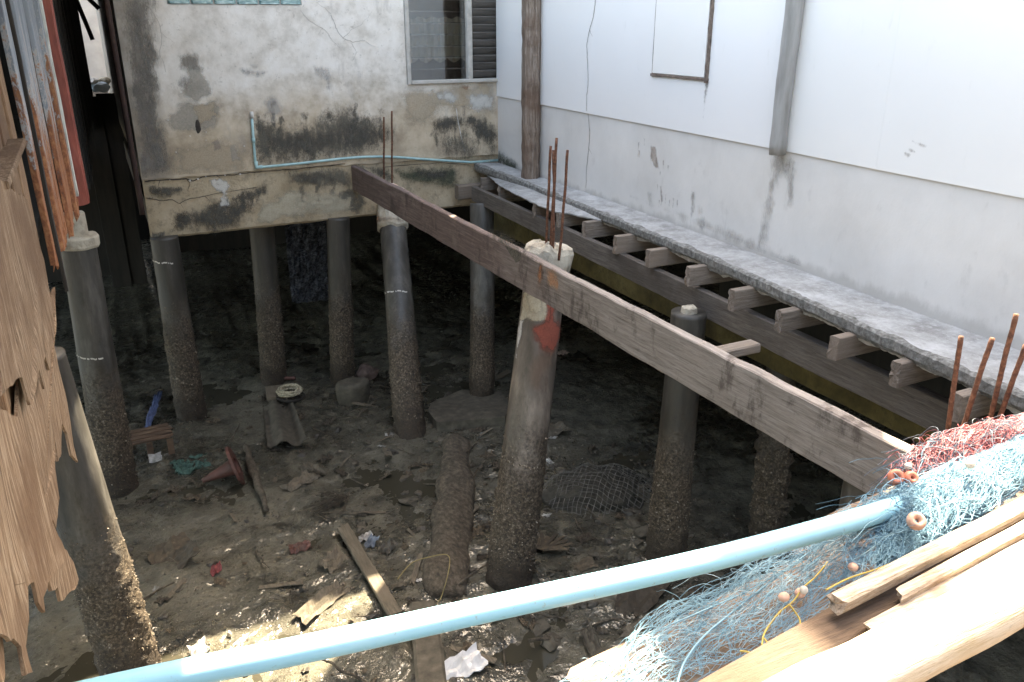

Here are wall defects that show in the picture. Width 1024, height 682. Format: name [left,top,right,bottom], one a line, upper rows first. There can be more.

crack [300,5,372,62]
crack [586,0,596,171]
leakage [175,179,267,232]
crack [145,164,341,209]
leakage [255,102,394,200]
mould [372,116,516,187]